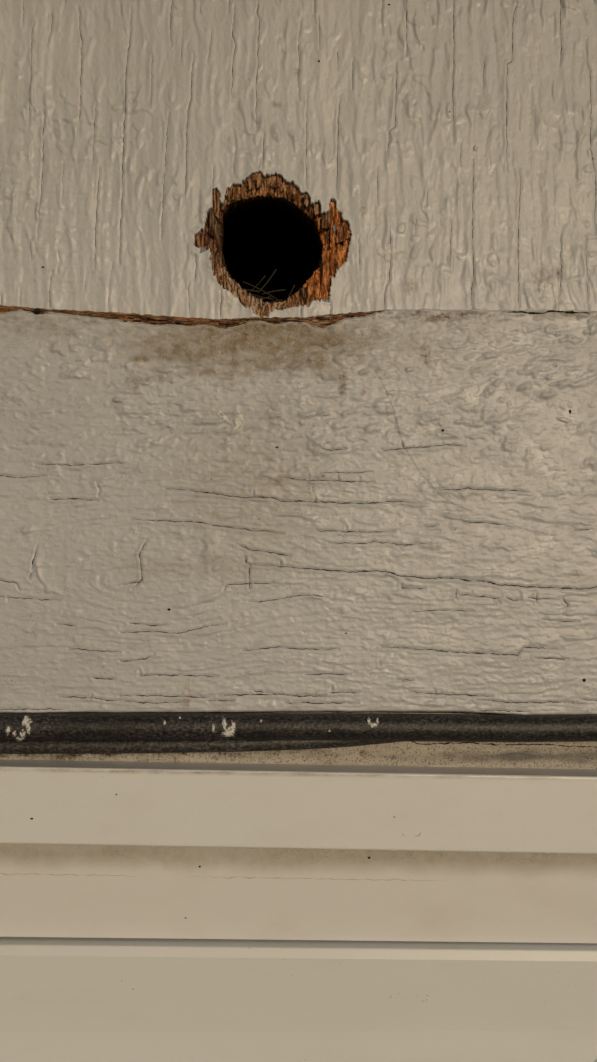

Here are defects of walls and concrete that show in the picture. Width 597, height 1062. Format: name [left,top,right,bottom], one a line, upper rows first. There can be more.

crack [22,0,153,311]
crack [161,0,265,235]
crack [298,0,353,178]
crack [483,2,518,146]
crack [502,189,589,314]
peeling [44,312,377,330]
crack [0,463,111,500]
crack [168,444,527,546]
crack [0,548,53,600]
crack [125,518,597,622]
crack [387,647,564,660]
crack [399,679,597,712]